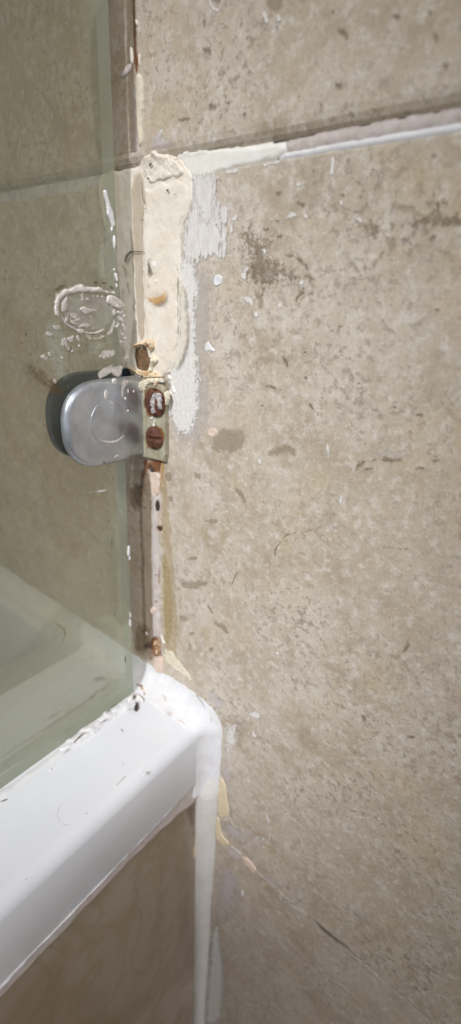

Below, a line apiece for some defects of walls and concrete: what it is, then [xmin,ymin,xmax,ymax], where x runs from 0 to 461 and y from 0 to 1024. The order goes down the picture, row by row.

rust [144,388,165,484]
rust [144,637,161,656]
crack [317,923,344,946]